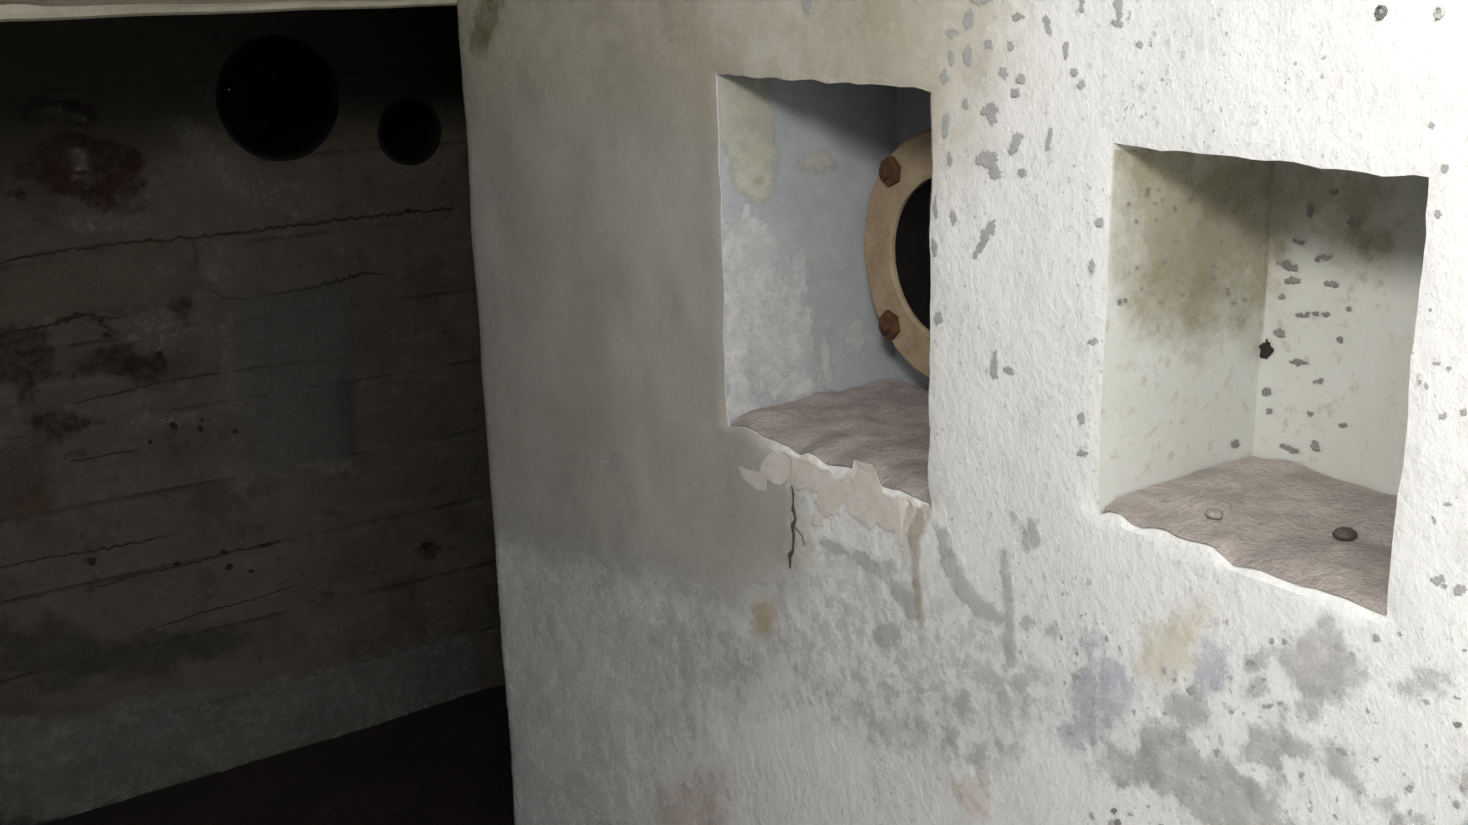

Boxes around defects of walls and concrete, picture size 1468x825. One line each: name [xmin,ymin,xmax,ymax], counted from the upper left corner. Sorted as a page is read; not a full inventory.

peeling [1111,0,1124,27]
peeling [1012,11,1086,89]
leakage [1117,148,1377,306]
spalling [1276,238,1332,299]
spalling [1295,306,1352,317]
peeling [458,0,1063,744]
spalling [1259,328,1324,384]
spalling [1279,440,1320,453]
peeling [1430,574,1467,596]
peeling [1061,618,1367,825]
peeling [1381,785,1424,825]
peeling [1453,774,1468,825]